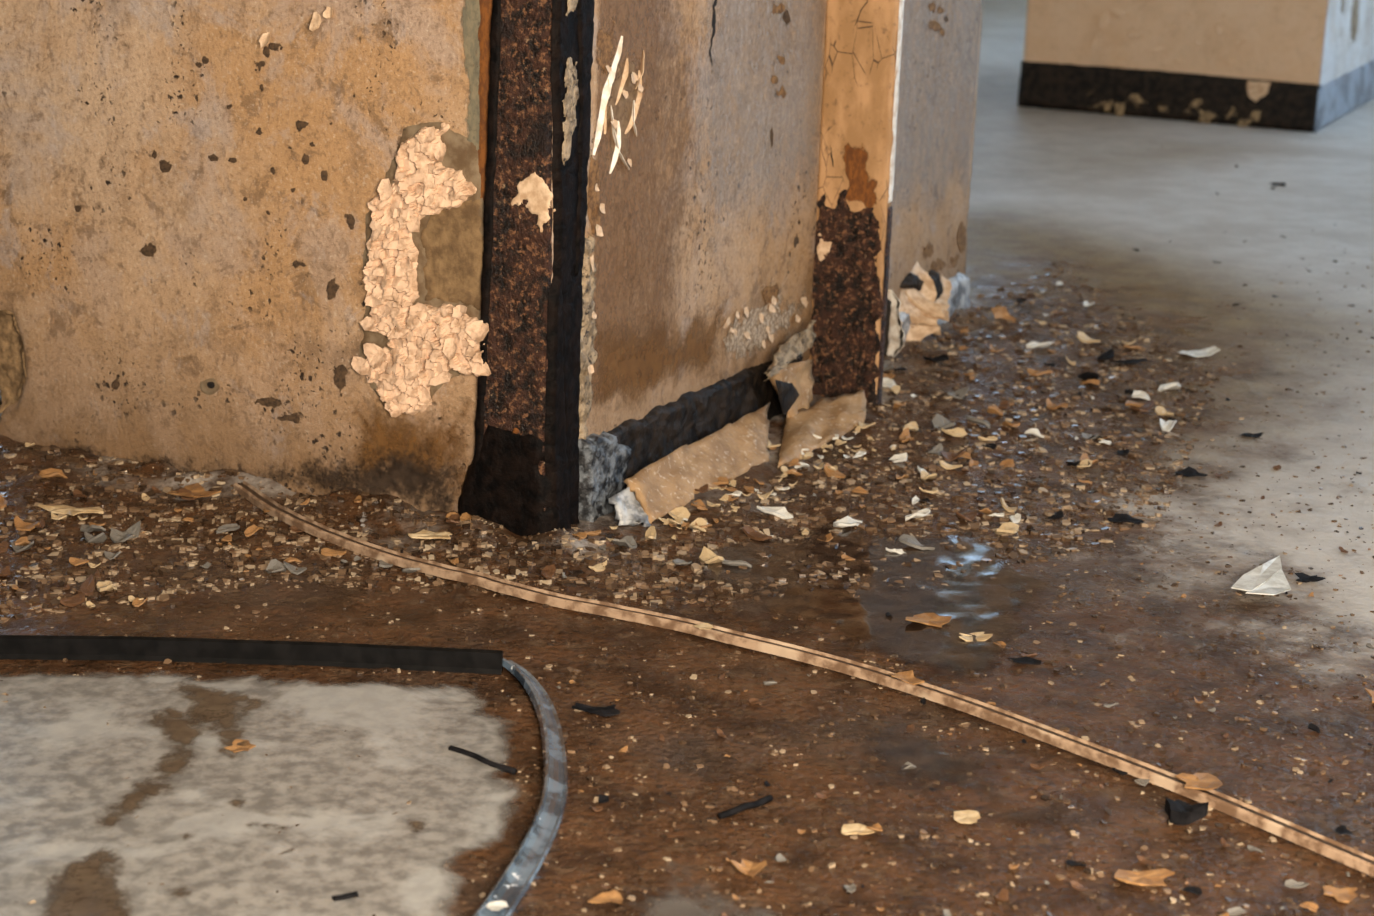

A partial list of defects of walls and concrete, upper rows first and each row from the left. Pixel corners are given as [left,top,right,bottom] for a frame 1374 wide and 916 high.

corrosion [478,0,493,200]
crack [709,0,717,65]
spalling [928,1,949,37]
spalling [1341,0,1359,43]
peeling [333,122,491,417]
corrosion [810,143,893,406]
spalling [572,20,1142,574]
corrosion [458,425,553,536]